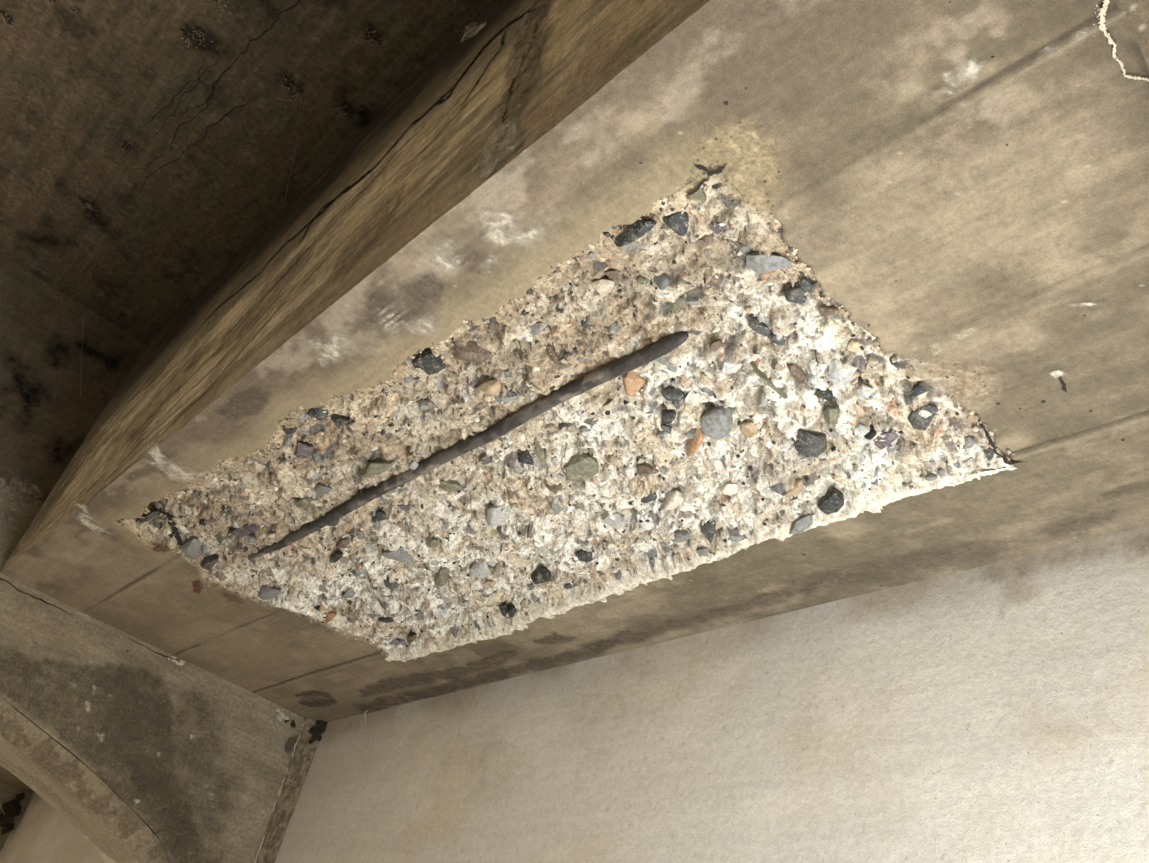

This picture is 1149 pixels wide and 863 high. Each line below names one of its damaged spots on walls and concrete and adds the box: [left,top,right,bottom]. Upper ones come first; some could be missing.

crack [1093,0,1149,82]
crack [47,0,539,525]
spalling [114,119,1018,662]
crack [1057,376,1067,393]
water stain [666,543,995,629]
water stain [360,631,653,713]
water stain [0,647,227,863]